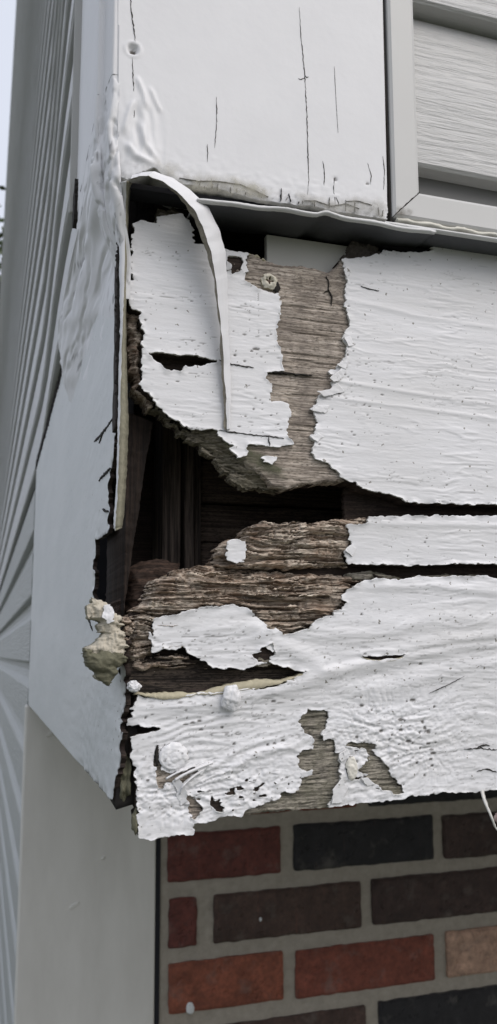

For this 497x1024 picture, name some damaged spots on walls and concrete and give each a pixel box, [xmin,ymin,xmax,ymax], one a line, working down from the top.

crack [179,7,385,217]
peeling [226,254,354,494]
peeling [205,517,367,571]
peeling [153,760,213,819]
peeling [244,710,403,815]
peeling [480,790,497,830]